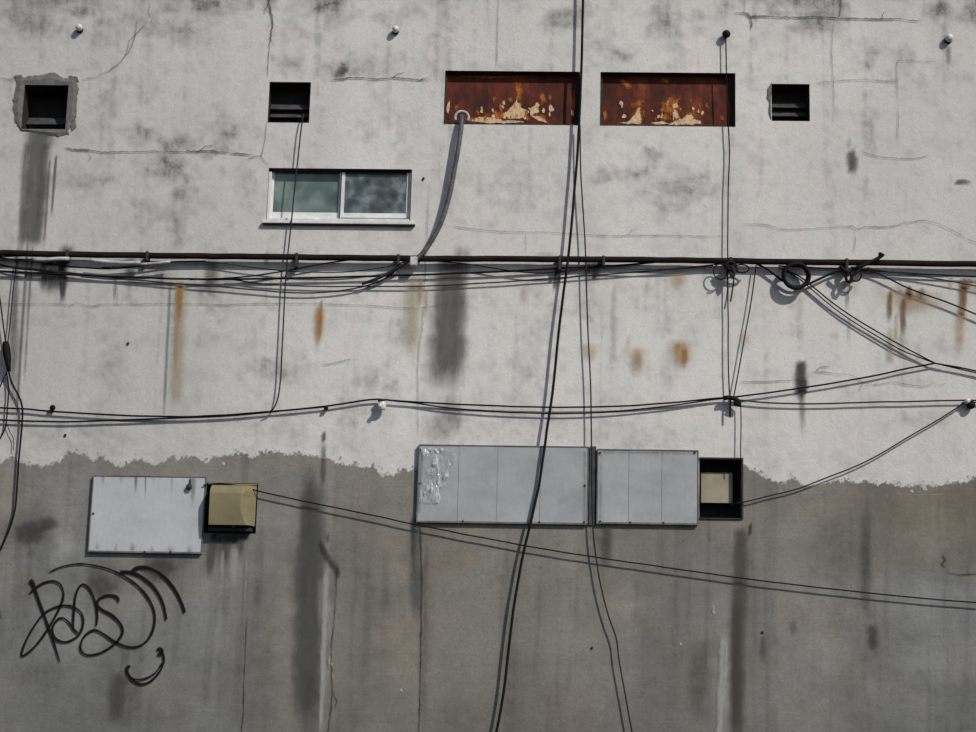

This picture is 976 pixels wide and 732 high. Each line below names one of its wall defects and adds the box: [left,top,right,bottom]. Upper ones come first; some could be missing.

crack [265,0,273,70]
water stain [21,131,57,250]
crack [66,145,262,160]
water stain [12,263,46,393]
rust [175,285,183,394]
water stain [437,262,464,374]
water stain [796,361,807,395]
rust [889,286,924,329]
rust [960,280,969,321]
water stain [296,490,340,723]
flaking render [0,444,976,732]
water stain [717,523,752,732]